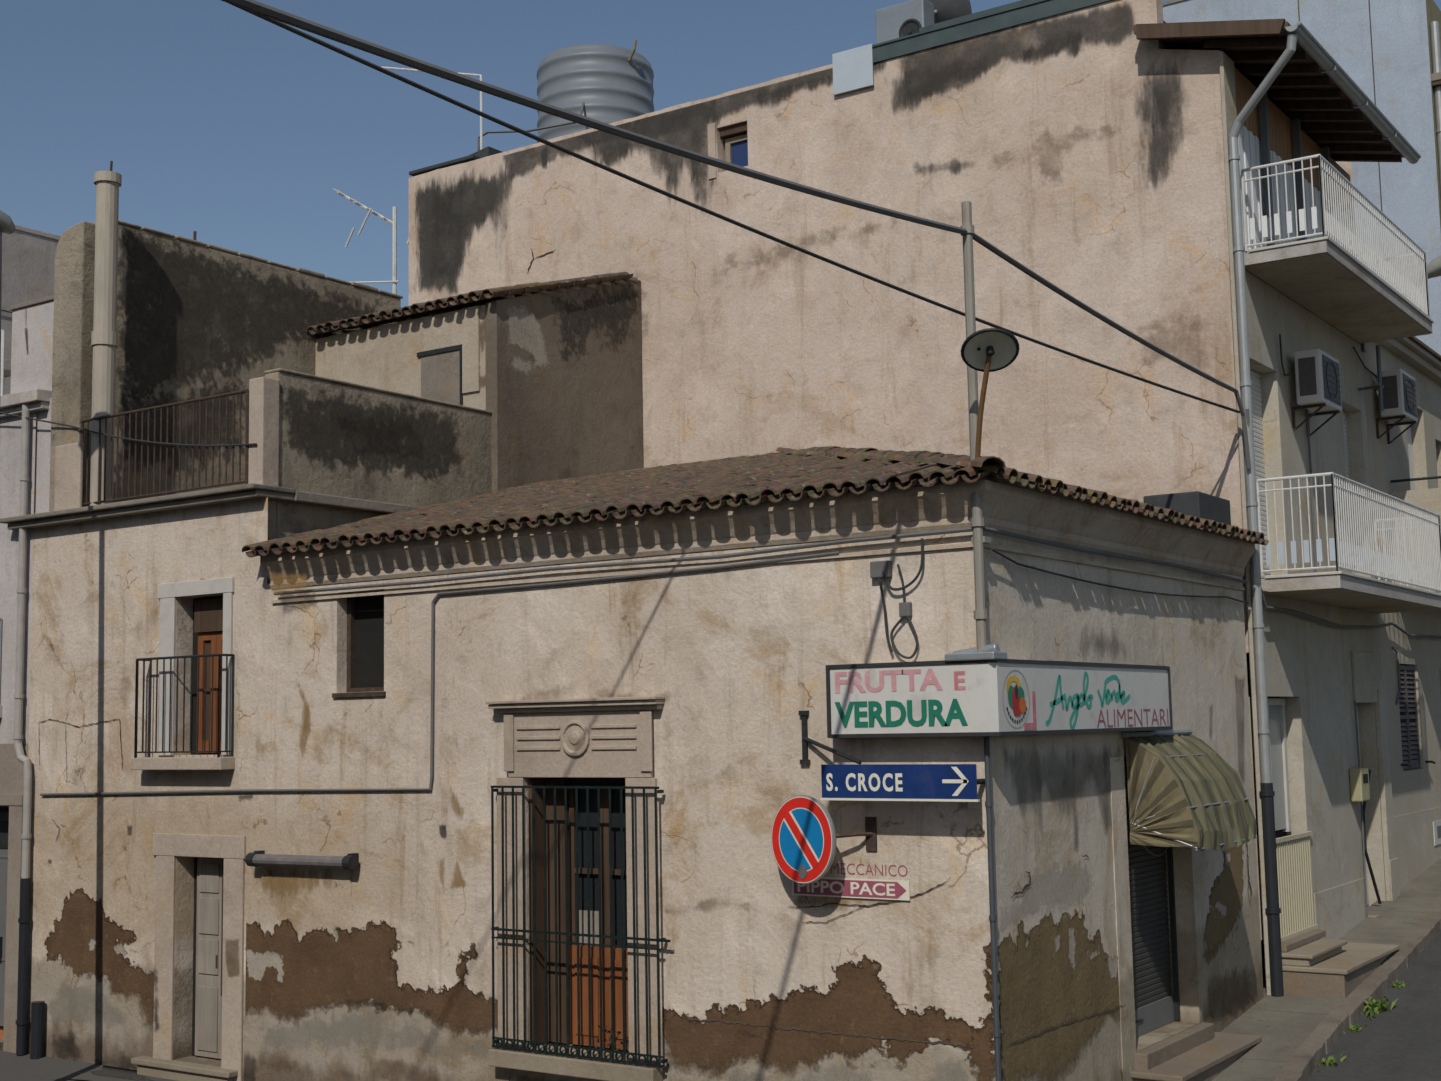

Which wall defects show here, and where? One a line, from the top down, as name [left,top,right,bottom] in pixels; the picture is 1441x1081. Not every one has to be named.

damp [893,5,1134,111]
damp [416,68,833,292]
damp [1140,71,1181,185]
damp [114,228,378,474]
damp [552,282,637,361]
damp [279,387,461,481]
flaking render [44,888,154,1025]
flaking render [245,918,498,1034]
flaking render [663,908,1120,1081]
flaking render [1204,845,1244,963]